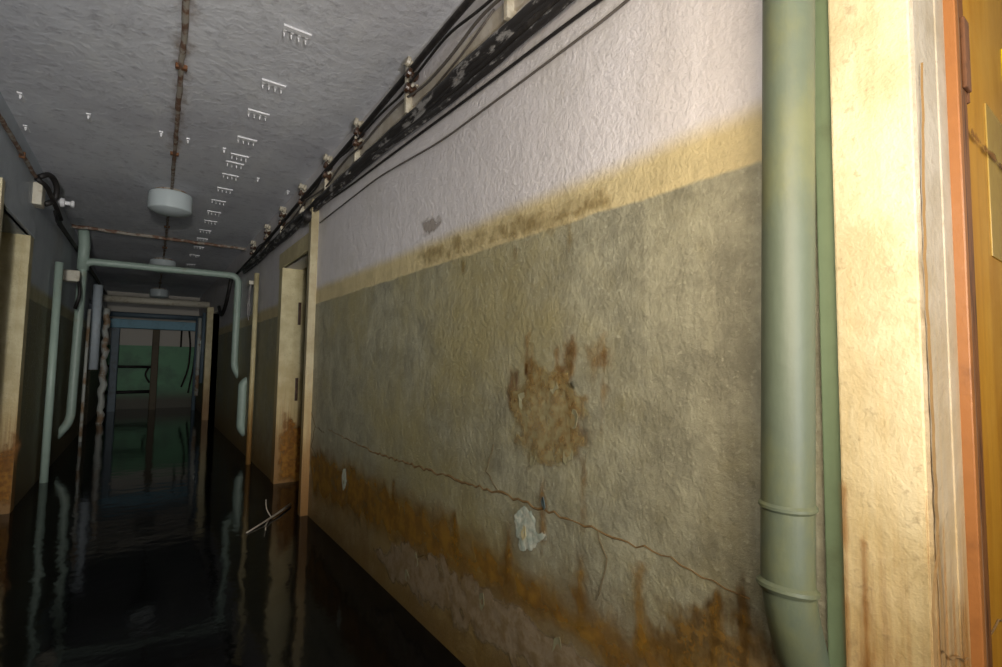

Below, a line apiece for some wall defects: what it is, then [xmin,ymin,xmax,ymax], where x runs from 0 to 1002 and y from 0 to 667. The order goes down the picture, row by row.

peeling [509,343,585,468]
crack [921,62,969,667]
crack [311,412,750,600]
damp [651,587,774,667]